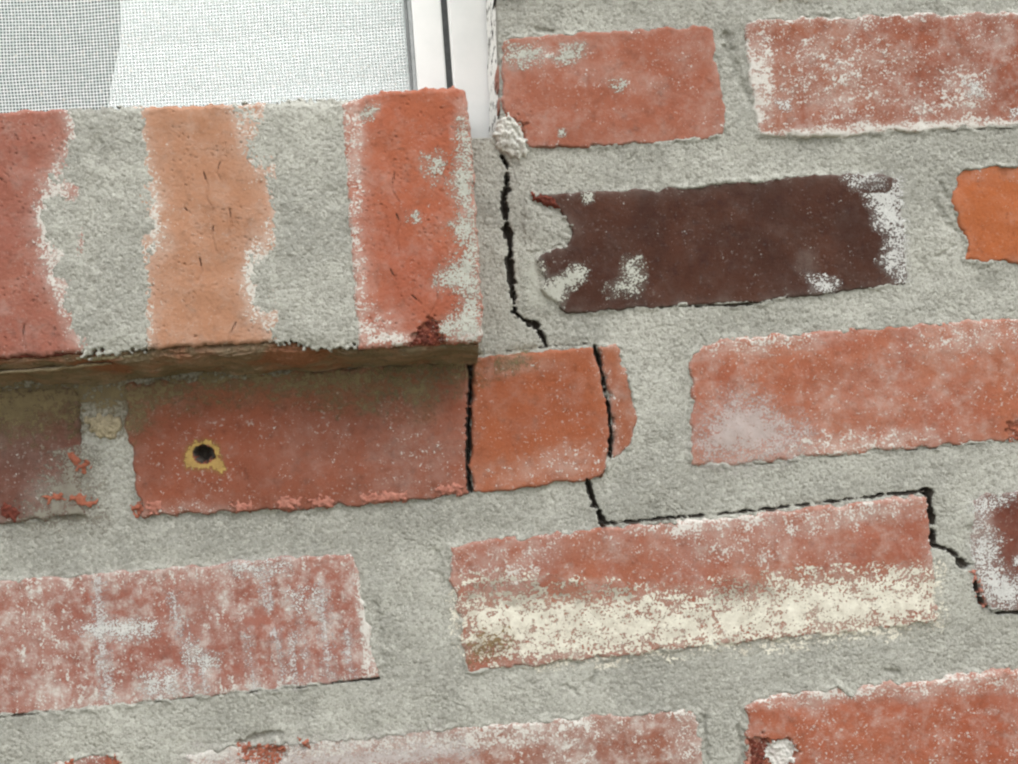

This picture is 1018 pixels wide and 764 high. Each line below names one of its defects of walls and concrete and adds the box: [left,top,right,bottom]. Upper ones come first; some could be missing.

peeling [410,116,483,347]
crack [465,365,473,493]
crack [500,154,1018,614]
efflorescence [73,576,161,705]
efflorescence [135,592,225,703]
efflorescence [224,553,358,692]
efflorescence [445,557,950,673]
spalling [236,741,289,764]
spalling [744,736,798,764]